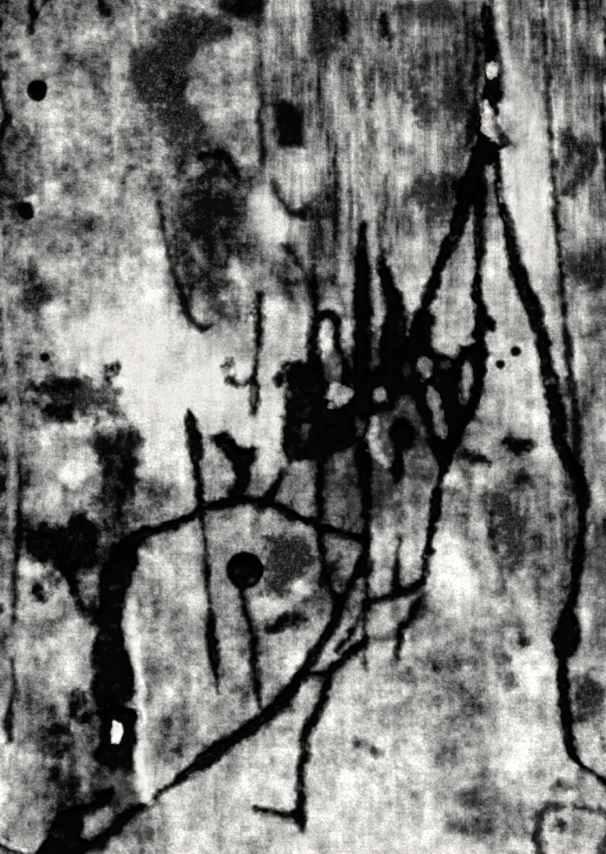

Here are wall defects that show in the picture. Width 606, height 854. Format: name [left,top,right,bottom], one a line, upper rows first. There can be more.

leakage [130,0,265,179]
crack [255,111,312,221]
leakage [23,361,144,620]
crack [156,201,213,333]
leakage [206,298,252,322]
crack [249,291,266,416]
crack [281,243,350,398]
leakage [323,341,355,405]
leakage [324,392,436,512]
crack [408,0,606,788]
crack [86,387,484,853]
crack [2,658,17,744]